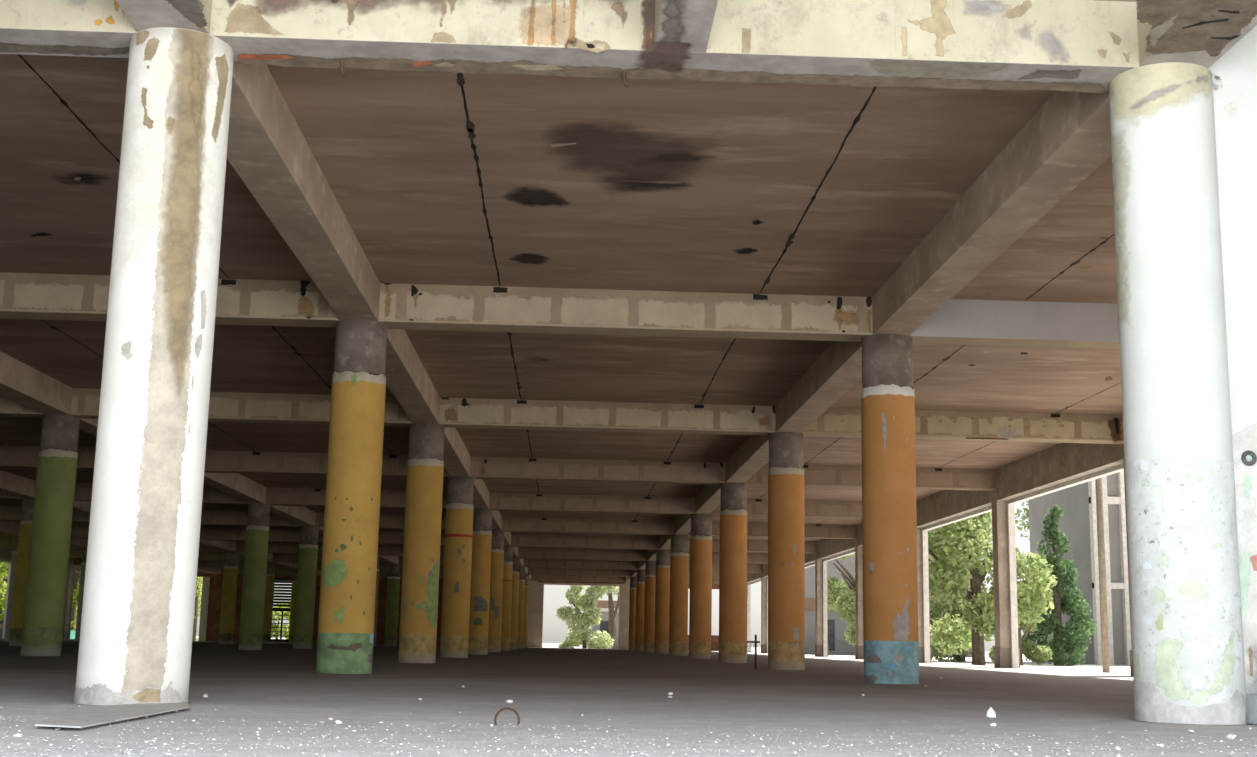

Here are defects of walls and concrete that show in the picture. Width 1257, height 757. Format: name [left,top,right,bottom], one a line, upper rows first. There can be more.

spalling [0,30,160,69]
water stain [259,0,456,27]
water stain [611,0,627,23]
water stain [640,0,691,72]
peeling [1097,32,1130,63]
peeling [1136,0,1257,57]
crack [457,72,508,293]
water stain [509,187,566,206]
crack [753,86,877,300]
water stain [511,254,547,264]
peeling [74,0,1120,705]
peeling [1128,423,1257,725]